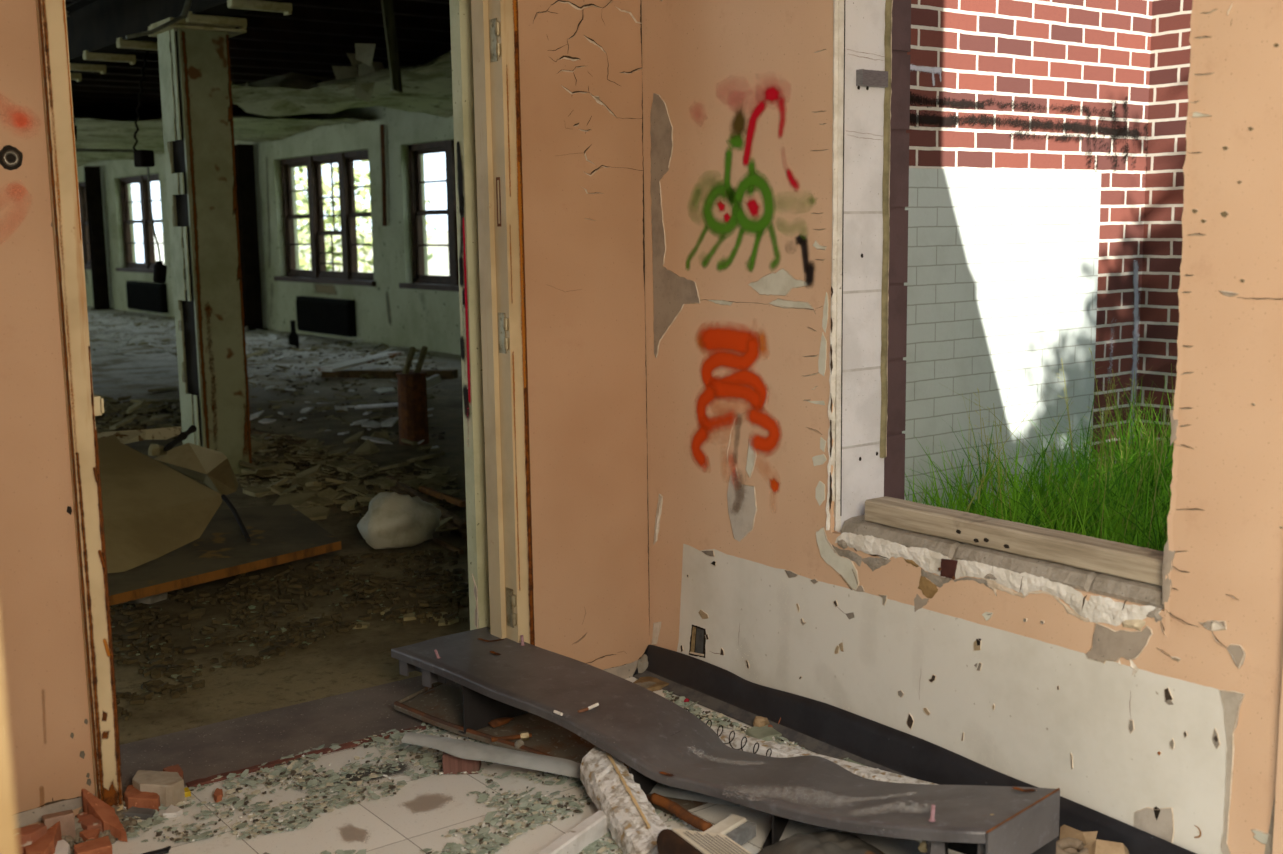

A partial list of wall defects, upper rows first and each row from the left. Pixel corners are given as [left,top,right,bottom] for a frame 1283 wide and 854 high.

peeling [332,43,385,91]
crack [533,0,645,291]
peeling [650,93,733,359]
crack [642,325,650,423]
spalling [748,0,1229,675]
crack [644,454,652,572]
peeling [1199,620,1246,669]
peeling [15,719,95,828]